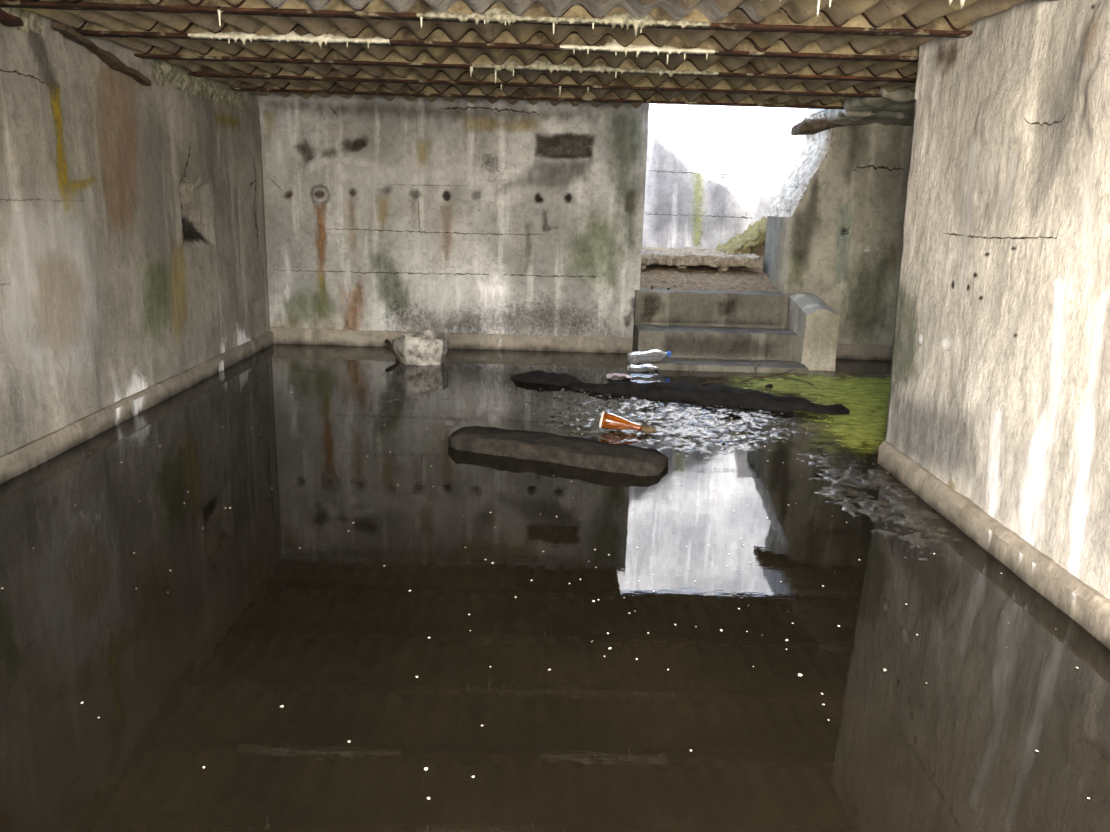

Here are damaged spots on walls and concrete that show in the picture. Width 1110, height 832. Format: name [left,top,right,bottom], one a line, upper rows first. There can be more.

damp [188,31,390,49]
damp [417,8,719,77]
crack [0,69,49,89]
crack [1024,110,1068,126]
corrosion [317,205,326,270]
crack [947,224,1061,239]
damp [1019,277,1066,565]
damp [1069,288,1110,577]
damp [988,411,1001,533]